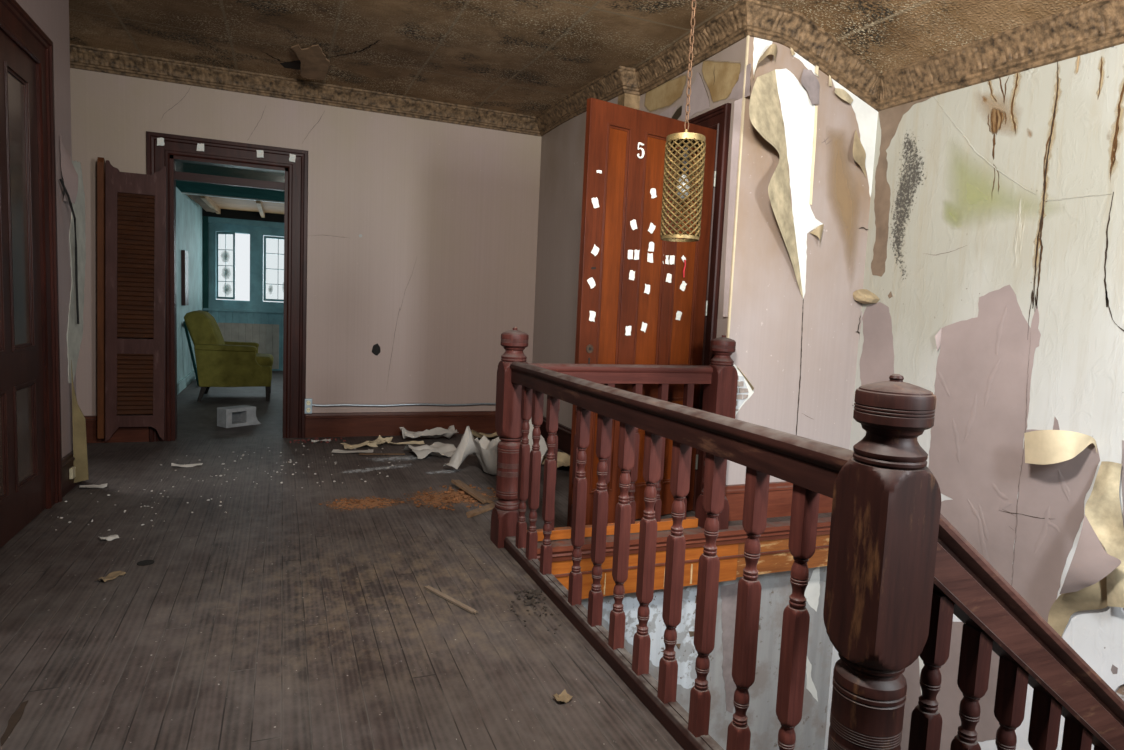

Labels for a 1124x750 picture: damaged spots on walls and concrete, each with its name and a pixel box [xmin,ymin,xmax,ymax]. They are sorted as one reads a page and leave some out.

peeling [749,37,878,298]
water stain [889,133,924,279]
rust [984,73,1020,192]
crack [934,61,1124,331]
rust [1110,81,1124,179]